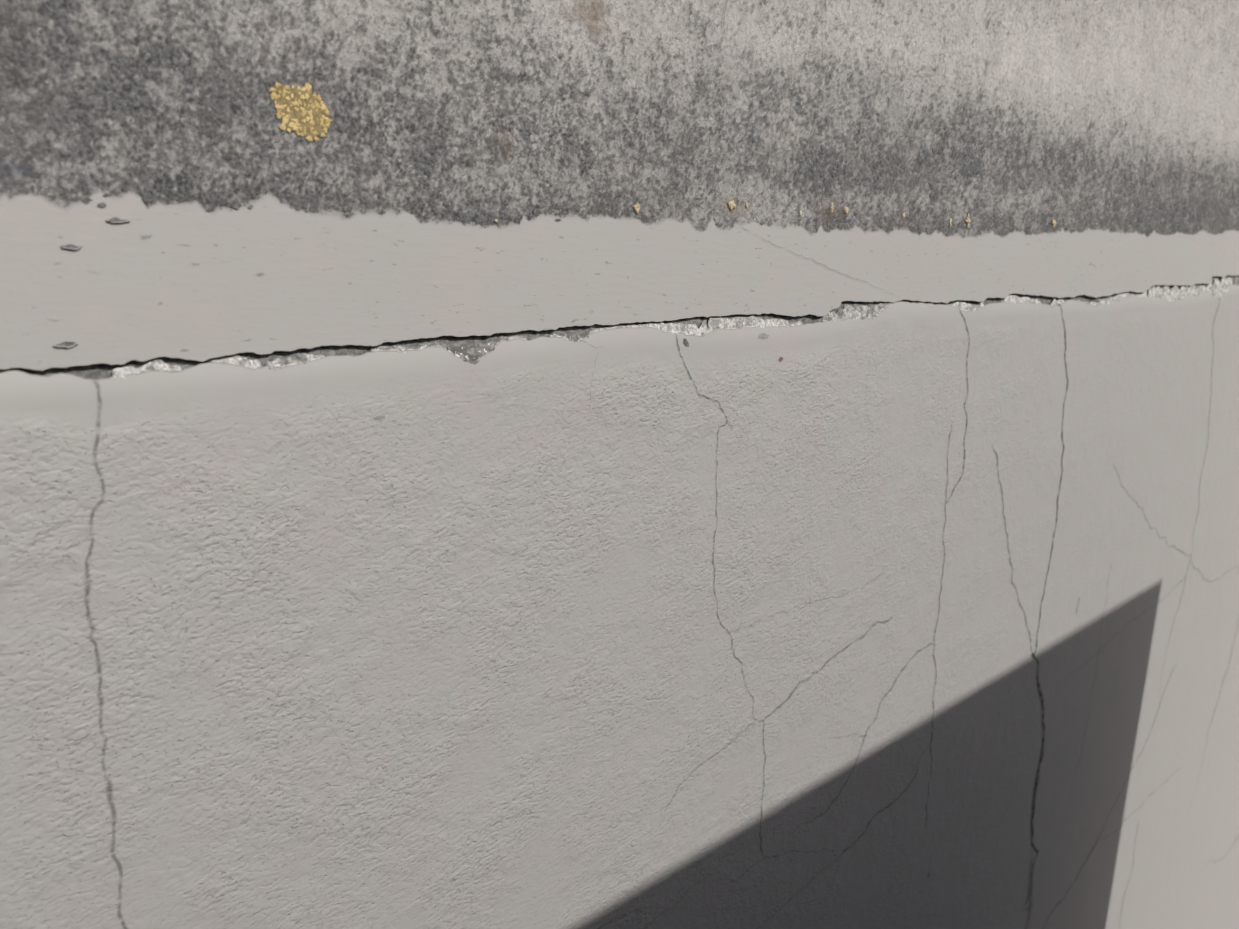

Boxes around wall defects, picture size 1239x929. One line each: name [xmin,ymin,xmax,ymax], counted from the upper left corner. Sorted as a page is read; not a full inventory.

peeling [82,193,132,223]
water stain [633,0,1239,237]
crack [0,275,1239,853]